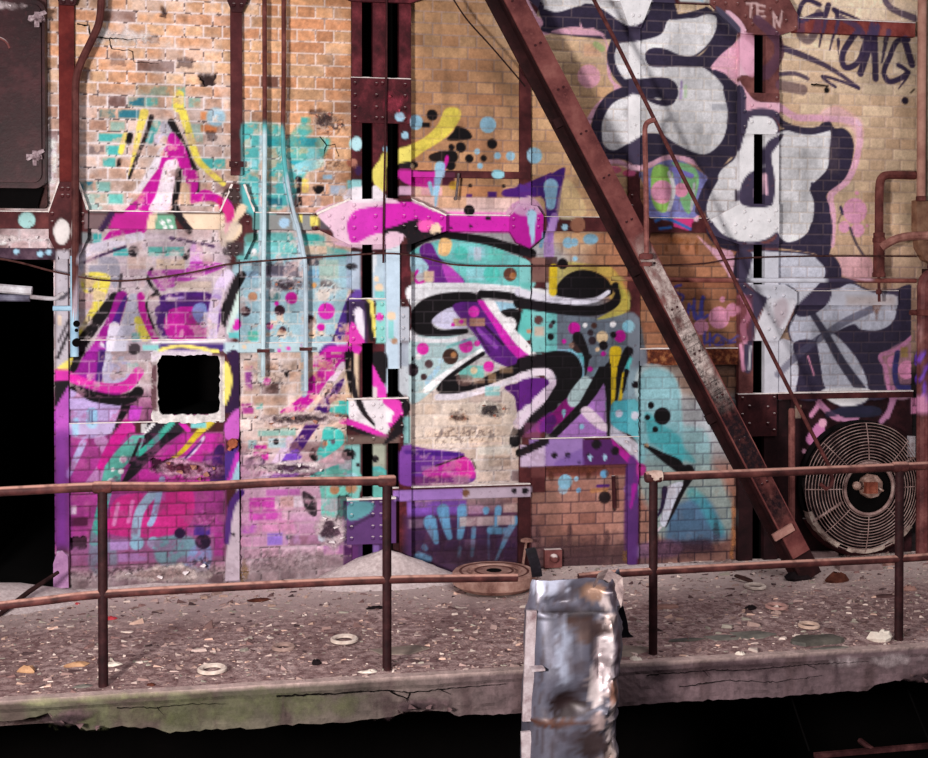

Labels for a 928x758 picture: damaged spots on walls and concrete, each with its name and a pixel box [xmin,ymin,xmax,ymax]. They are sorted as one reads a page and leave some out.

corrosion [548,465,608,479]